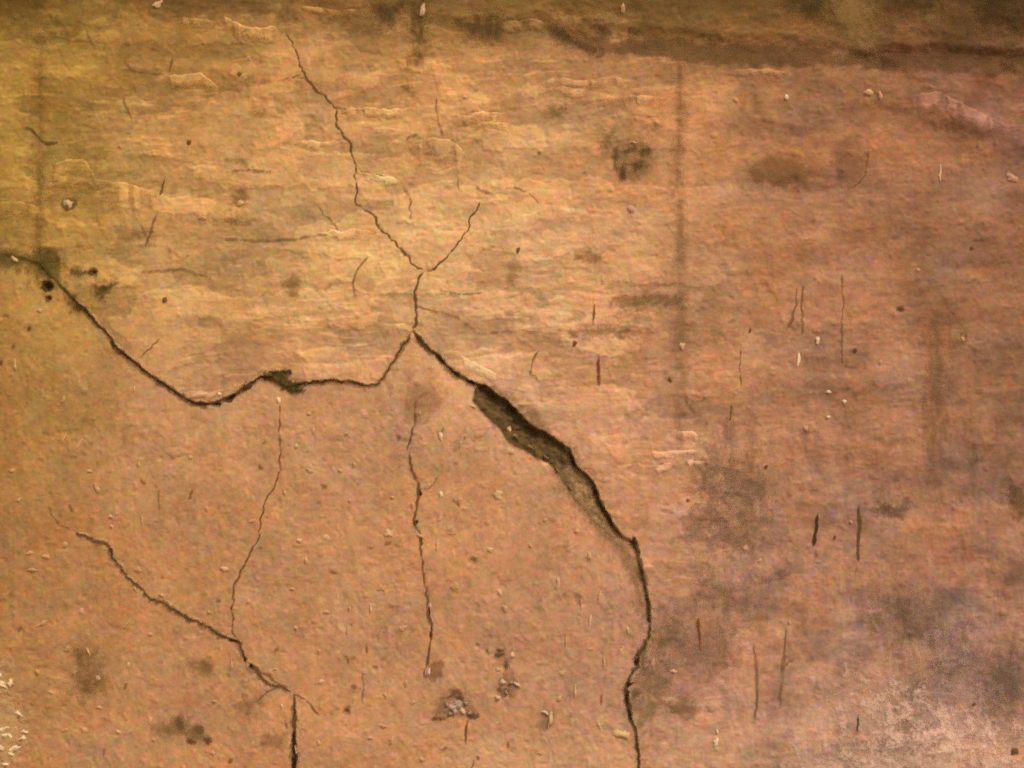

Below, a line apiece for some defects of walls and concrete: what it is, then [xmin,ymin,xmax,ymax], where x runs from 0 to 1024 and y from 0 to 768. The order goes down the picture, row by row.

crack [25,127,58,145]
crack [142,180,165,244]
crack [148,267,210,278]
crack [232,166,271,174]
crack [225,208,338,242]
crack [285,34,539,386]
crack [74,299,266,406]
crack [49,405,319,768]
crack [407,393,439,678]
crack [569,451,653,768]